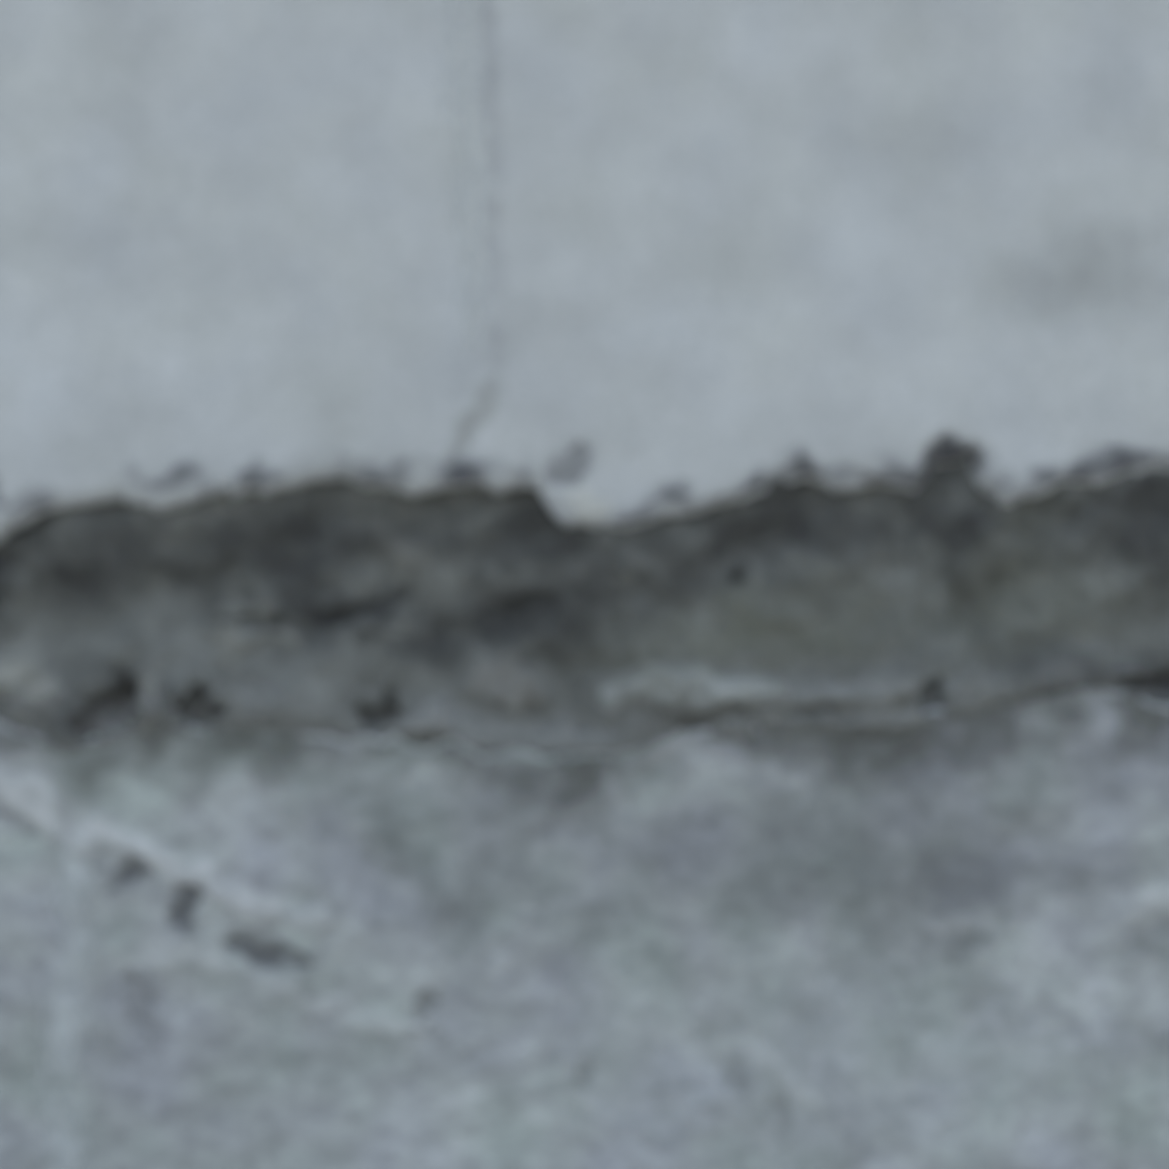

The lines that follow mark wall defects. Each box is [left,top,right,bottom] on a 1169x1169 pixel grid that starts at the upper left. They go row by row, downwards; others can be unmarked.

spalling [542,441,613,525]
spalling [754,433,990,490]